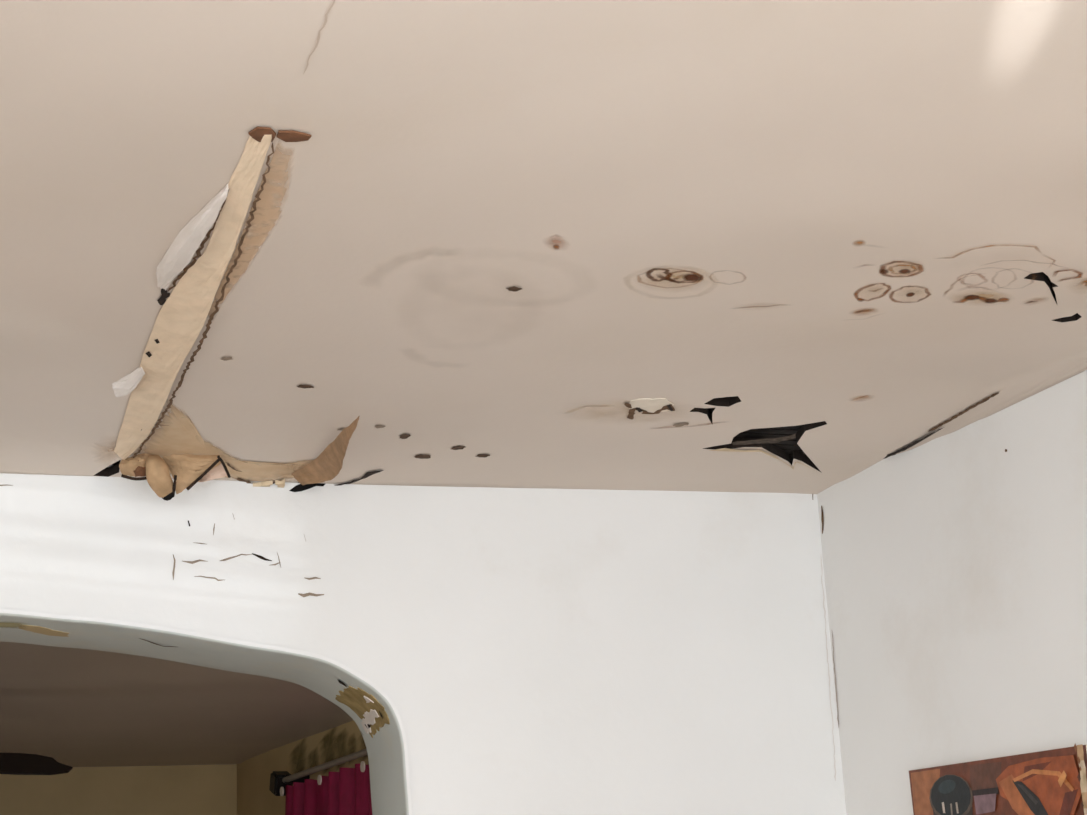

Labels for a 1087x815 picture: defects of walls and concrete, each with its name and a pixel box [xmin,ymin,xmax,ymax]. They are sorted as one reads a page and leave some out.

peeling [156,184,229,290]
water stain [647,268,703,283]
water stain [854,261,931,312]
water stain [958,295,1009,303]
peeling [112,367,145,398]
peeling [624,398,675,420]
peeling [145,406,313,488]
peeling [335,686,390,738]